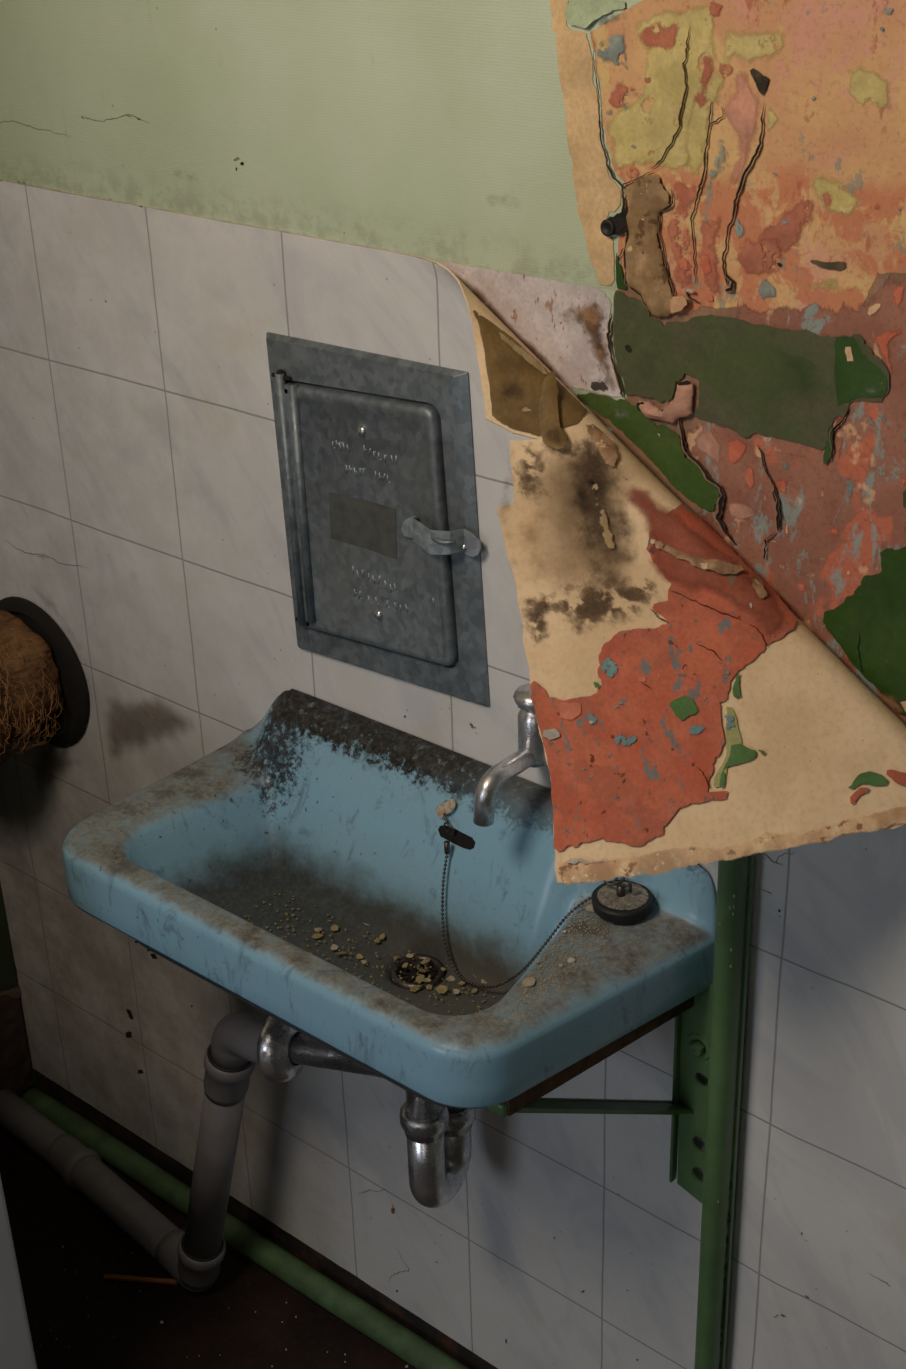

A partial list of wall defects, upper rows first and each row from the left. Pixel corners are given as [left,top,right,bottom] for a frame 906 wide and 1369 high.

crack [2,114,148,135]
crack [591,24,764,398]
peeling [439,0,906,725]
water stain [650,538,767,599]
water stain [526,580,652,641]